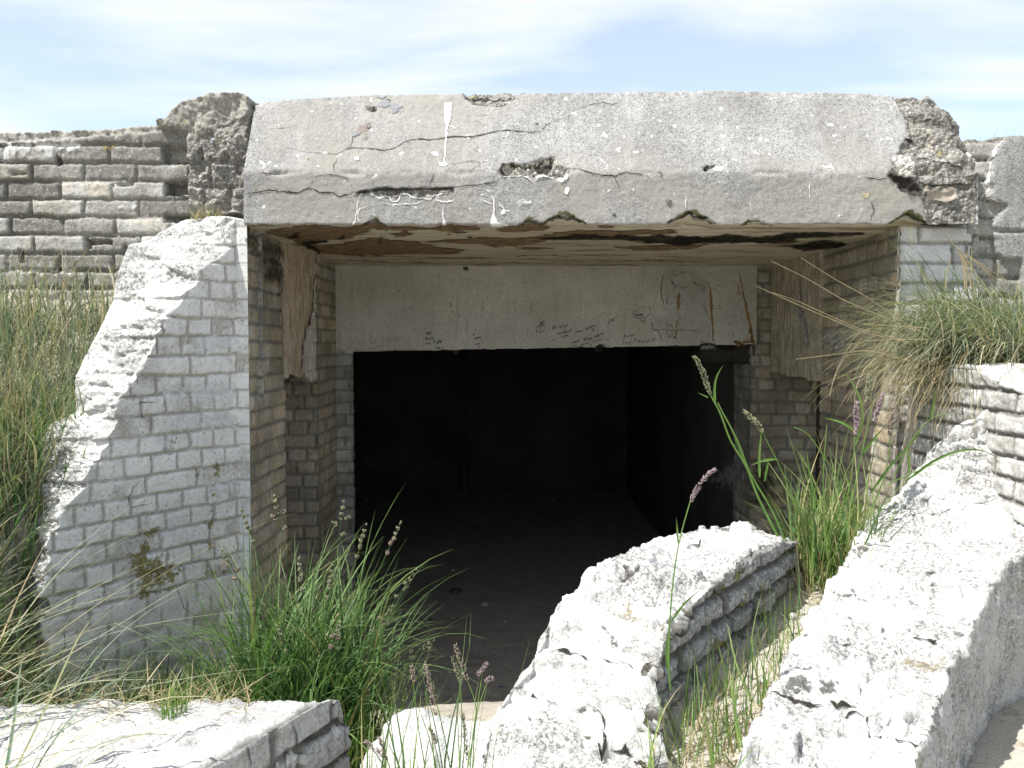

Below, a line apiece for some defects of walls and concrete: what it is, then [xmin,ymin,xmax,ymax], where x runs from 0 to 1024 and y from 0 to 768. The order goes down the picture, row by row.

spalling [462,93,525,108]
spalling [186,110,253,206]
crack [247,102,618,197]
damp [481,190,510,227]
spalling [497,155,569,182]
crack [566,167,662,186]
spalling [889,97,1003,226]
rust [734,272,754,346]